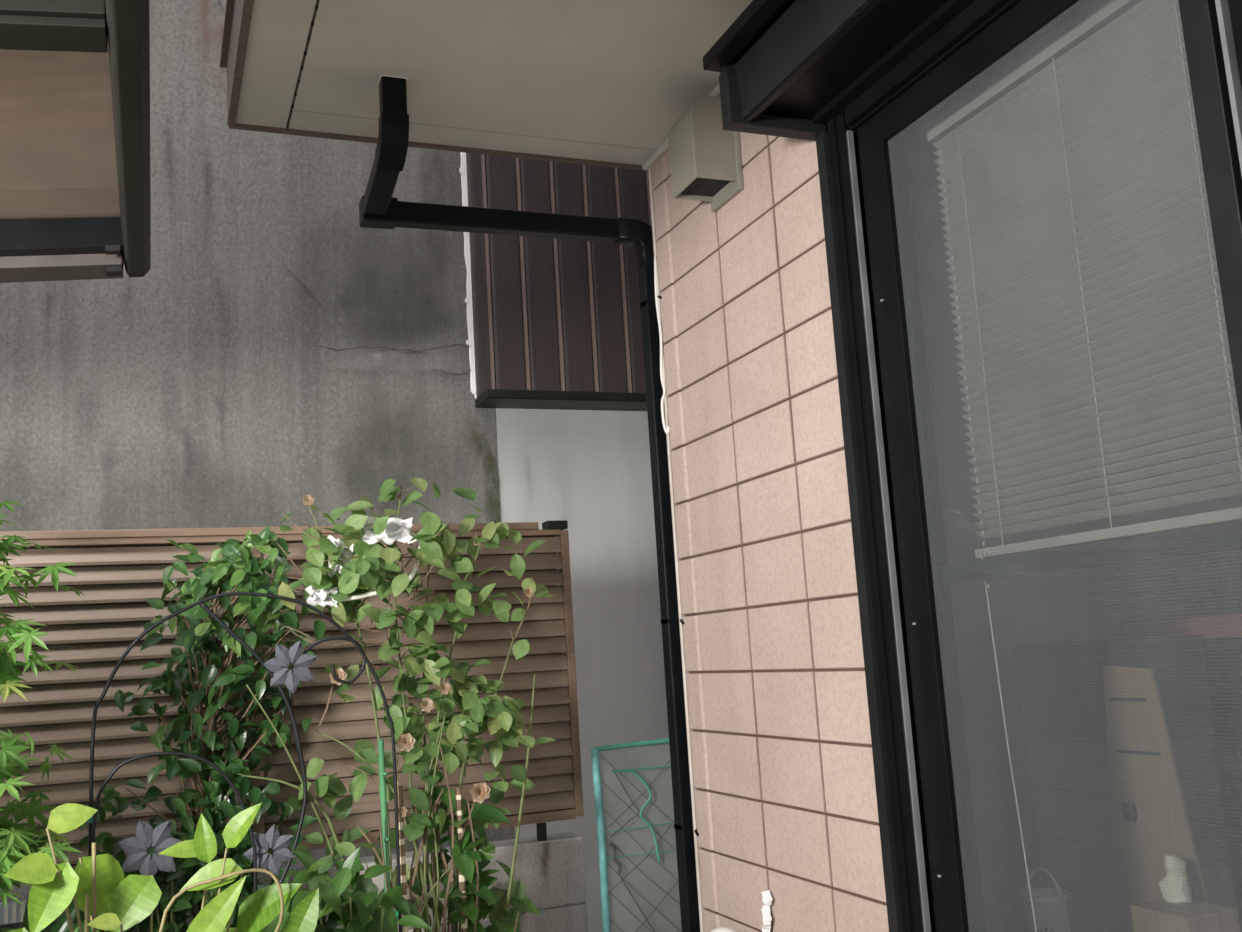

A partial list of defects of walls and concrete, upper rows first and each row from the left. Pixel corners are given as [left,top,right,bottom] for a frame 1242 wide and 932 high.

crack [309,335,471,376]